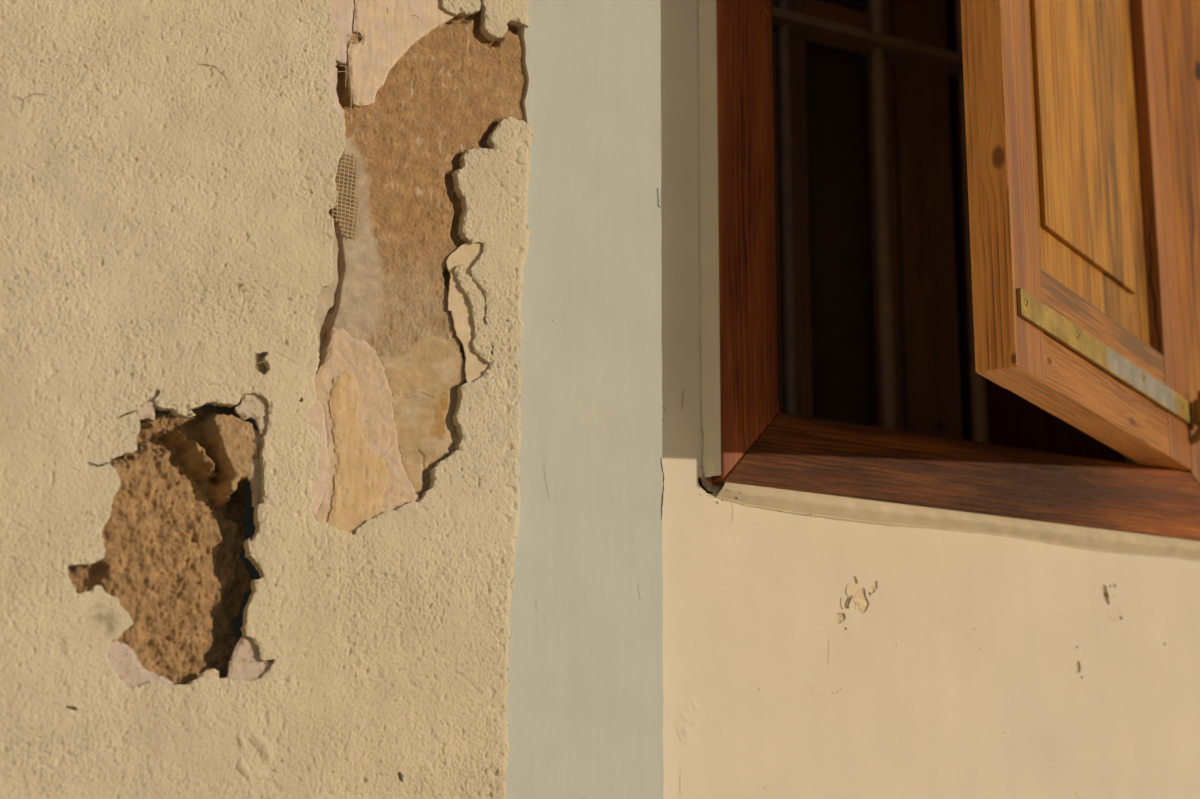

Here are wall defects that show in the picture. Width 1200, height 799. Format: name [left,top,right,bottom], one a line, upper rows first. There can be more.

peeling [299,0,530,534]
spalling [68,391,272,688]
spalling [836,577,877,630]